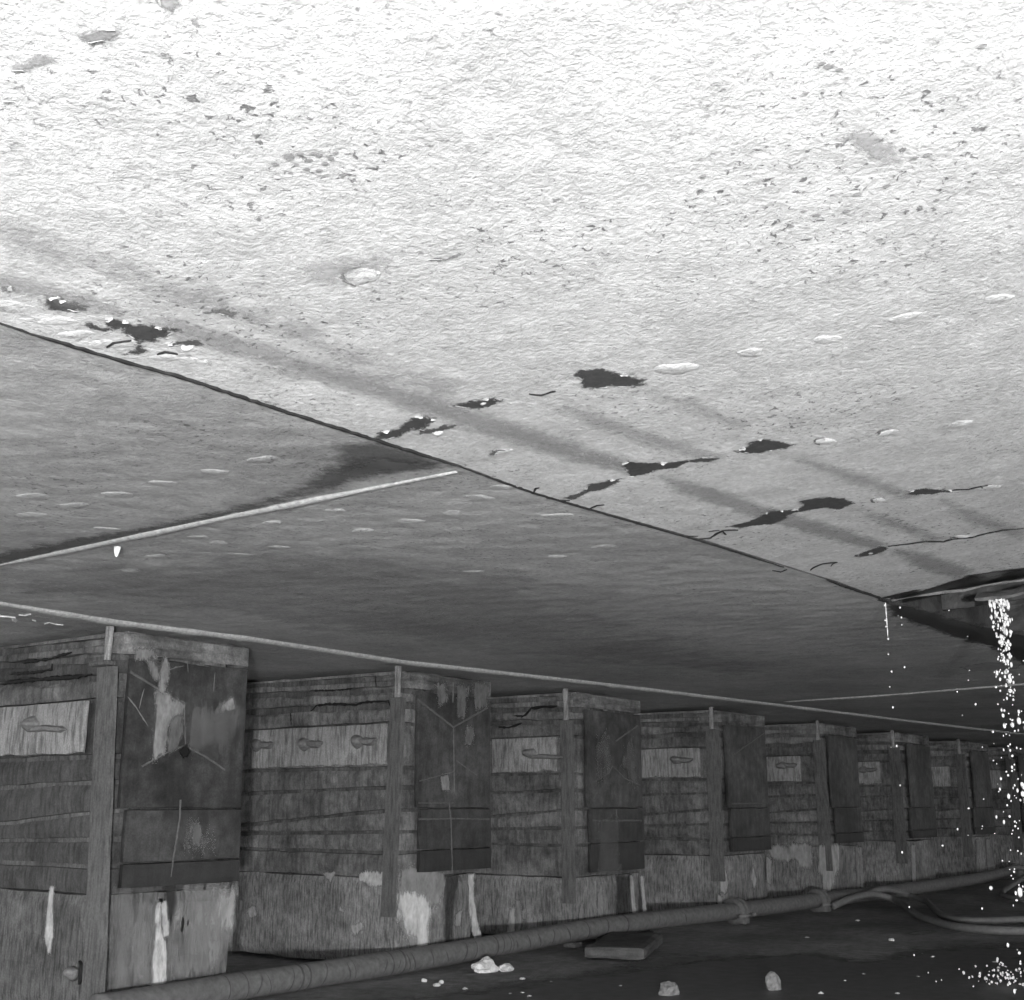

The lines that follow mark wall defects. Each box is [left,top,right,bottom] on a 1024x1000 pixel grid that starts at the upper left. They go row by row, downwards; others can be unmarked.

peeling [46,295,86,313]
peeling [85,317,204,355]
peeling [574,368,646,389]
peeling [374,416,456,439]
water stain [302,366,623,467]
peeling [453,398,502,409]
peeling [735,439,796,454]
peeling [566,458,720,500]
water stain [0,444,437,564]
peeling [727,497,854,528]
crack [888,528,1024,547]
water stain [882,568,1024,671]